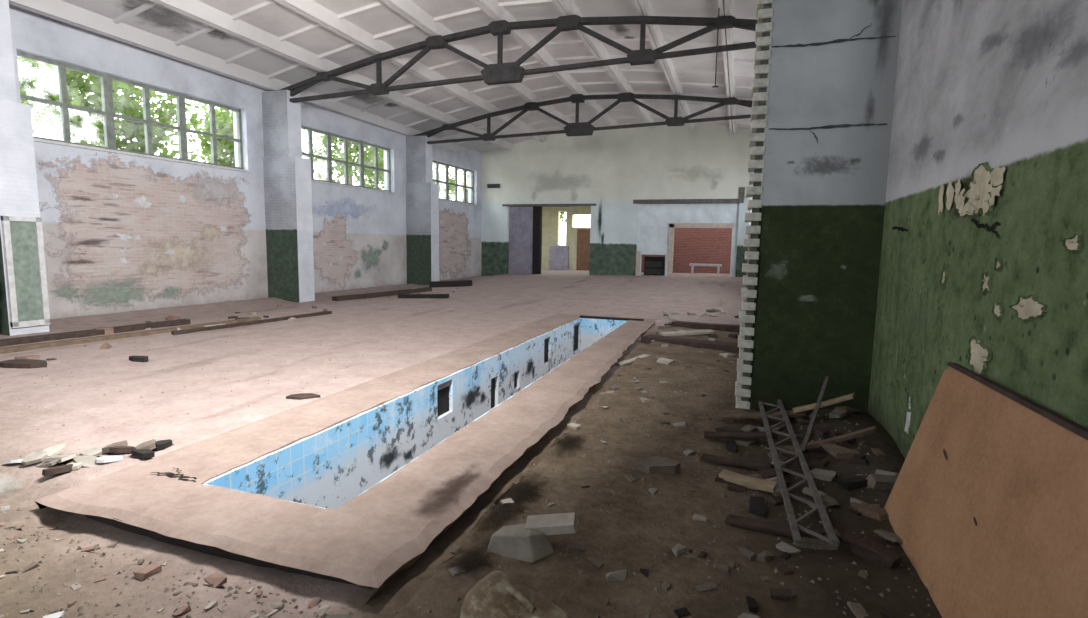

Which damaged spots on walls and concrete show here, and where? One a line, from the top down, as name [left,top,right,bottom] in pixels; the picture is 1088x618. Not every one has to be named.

damp [126,1,186,27]
crack [771,23,896,48]
crack [769,123,888,143]
flaking render [938,162,1005,219]
flaking render [38,152,251,310]
flaking render [313,212,357,289]
flaking render [439,208,471,279]
crack [971,219,1000,239]
peeling [1062,230,1084,253]
peeling [981,255,1048,323]
flaking render [968,335,992,377]